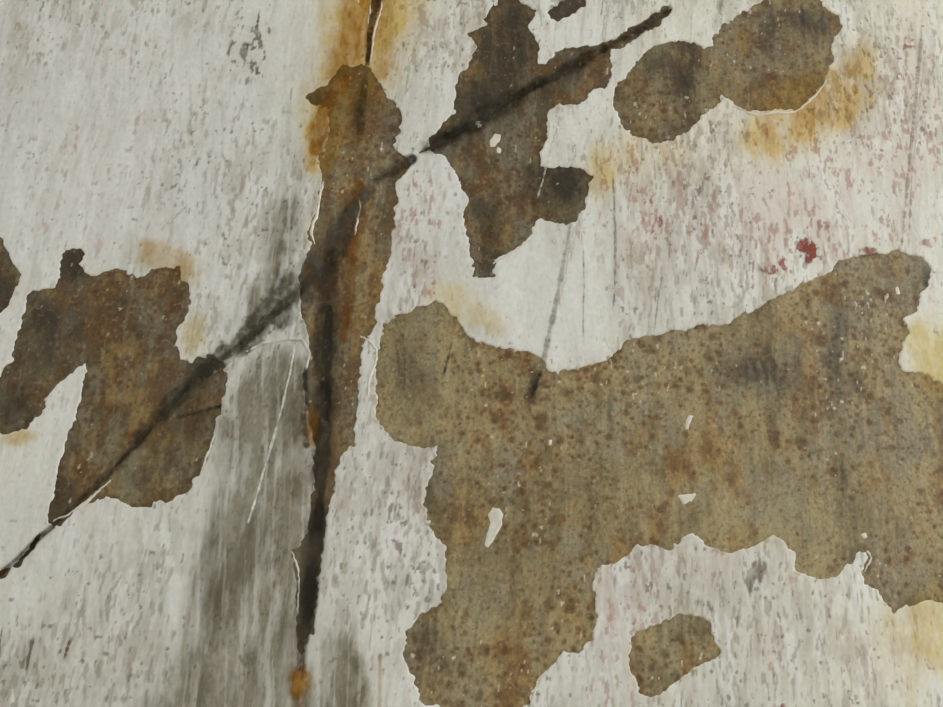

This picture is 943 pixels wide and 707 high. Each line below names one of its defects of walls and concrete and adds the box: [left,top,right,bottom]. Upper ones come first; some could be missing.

crack [353,0,383,64]
crack [437,65,575,145]
peeling [419,0,842,278]
peeling [0,237,228,528]
crack [203,154,417,644]
peeling [291,64,943,707]
peeling [0,534,41,579]